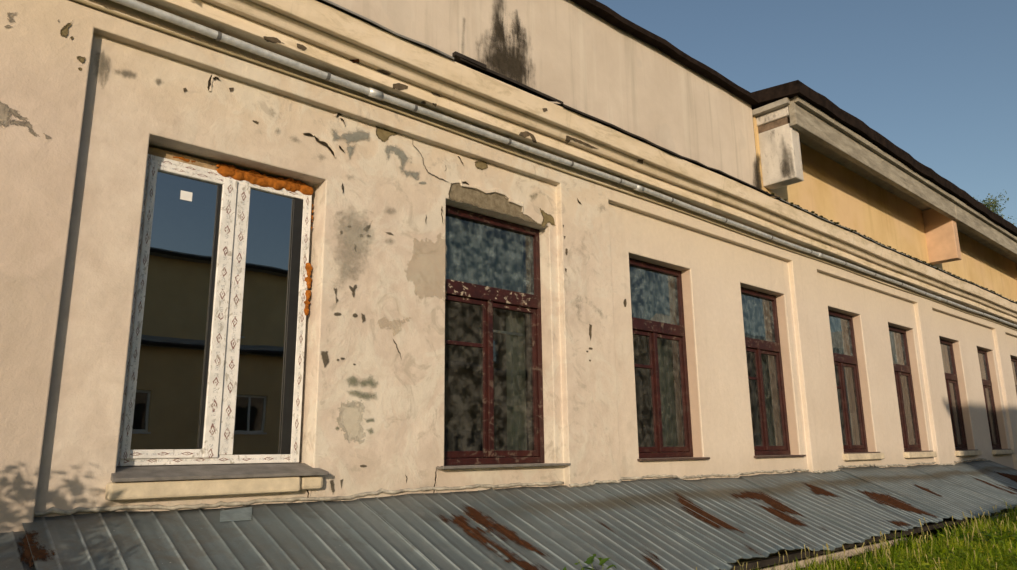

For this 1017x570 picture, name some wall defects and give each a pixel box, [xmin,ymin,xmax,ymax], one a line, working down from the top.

leakage [481,0,529,85]
flaking render [0,102,51,139]
flaking render [376,126,397,142]
flaking render [449,180,568,255]
rust [675,493,744,533]
rust [732,491,808,527]
rust [804,483,841,498]
rust [858,490,939,527]
rust [439,504,549,570]